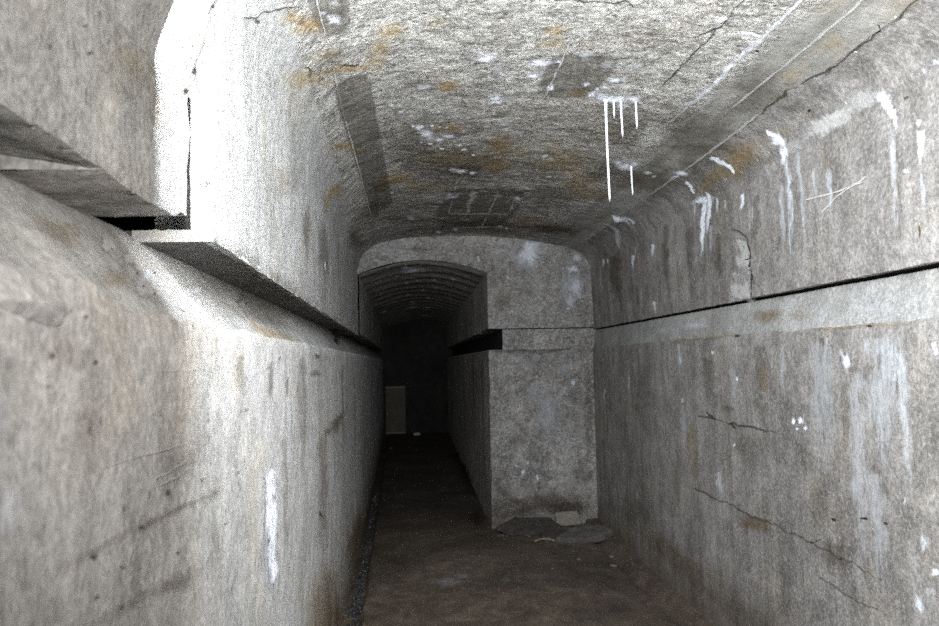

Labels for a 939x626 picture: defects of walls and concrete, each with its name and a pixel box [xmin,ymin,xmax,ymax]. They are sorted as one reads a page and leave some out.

crack [196,0,218,64]
crack [555,0,633,8]
crack [663,0,802,107]
crack [749,0,917,123]
water stain [876,91,897,124]
water stain [614,160,656,178]
water stain [671,171,726,253]
water stain [710,157,735,174]
water stain [766,130,804,255]
water stain [917,120,925,163]
crack [733,229,756,301]
crack [698,412,776,433]